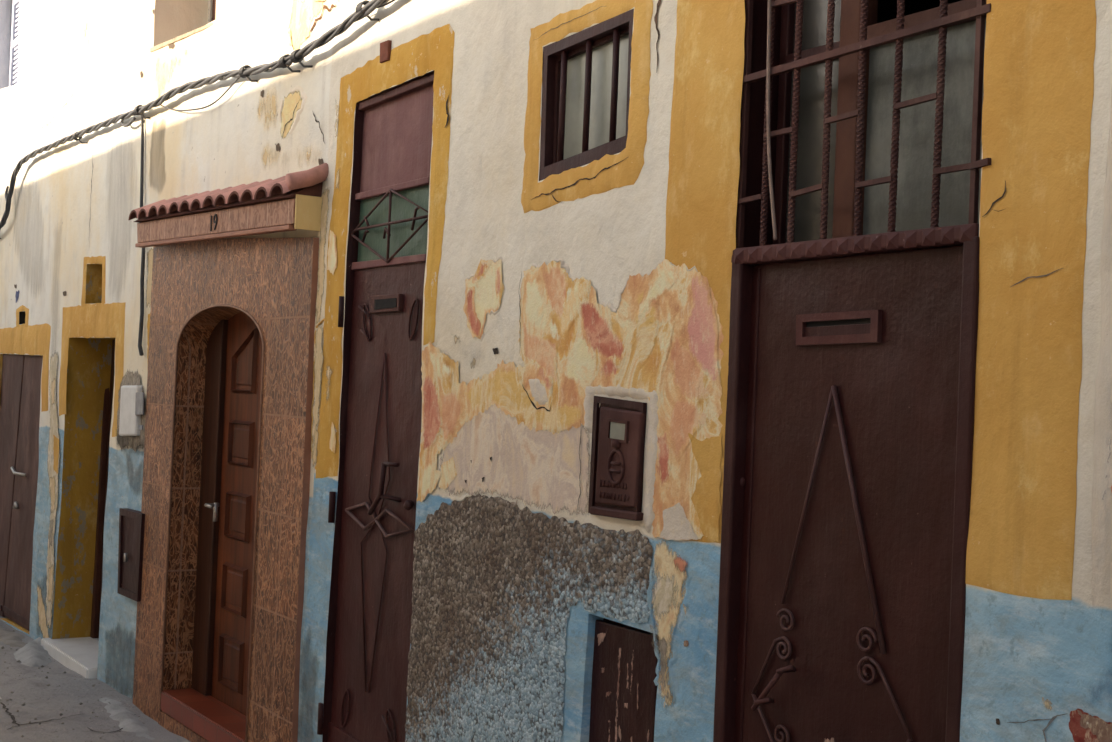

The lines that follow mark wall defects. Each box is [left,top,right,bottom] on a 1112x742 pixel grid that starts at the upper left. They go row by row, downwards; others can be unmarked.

peeling [285,0,337,50]
crack [653,0,661,73]
peeling [275,85,307,152]
crack [982,181,1006,217]
crack [1011,268,1063,287]
spalling [405,256,724,742]
crack [1007,713,1067,742]
peeling [1069,709,1112,742]